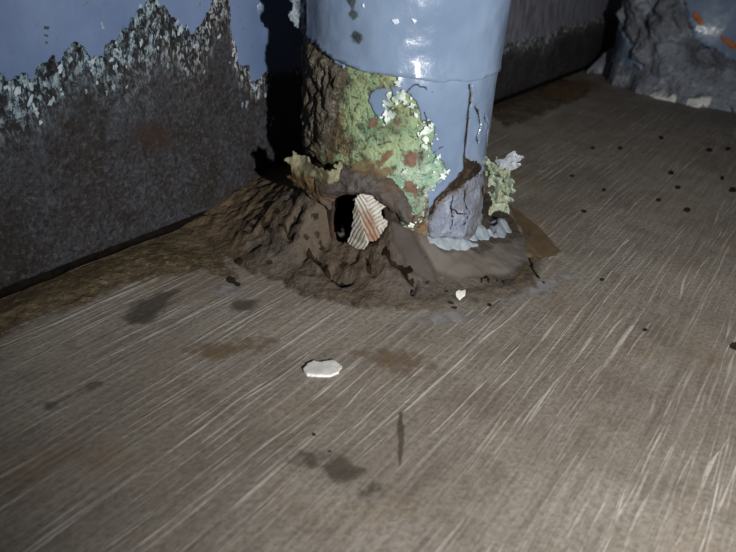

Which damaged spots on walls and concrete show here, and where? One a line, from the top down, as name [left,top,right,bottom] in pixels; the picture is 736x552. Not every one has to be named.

peeling [0,0,524,289]
rust [350,150,393,178]
rust [402,150,417,167]
crack [428,84,485,233]
rust [405,181,418,199]
leakage [127,293,173,323]
leakage [326,458,365,480]